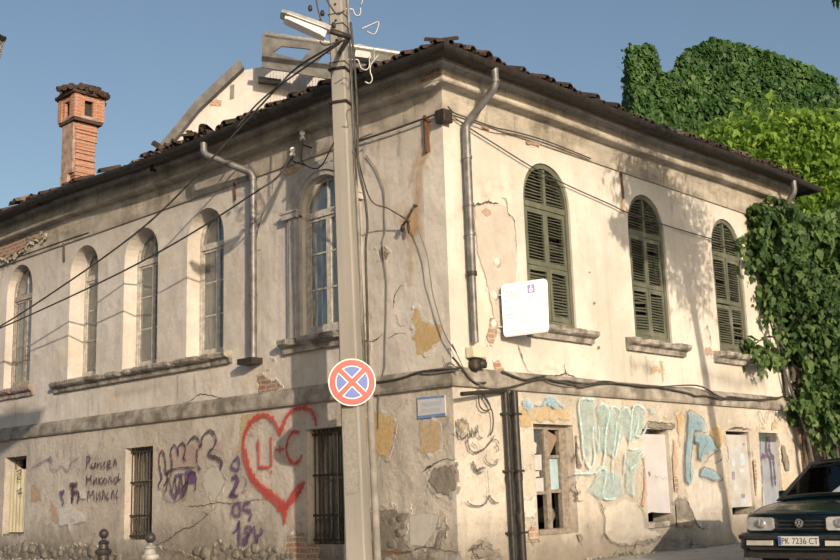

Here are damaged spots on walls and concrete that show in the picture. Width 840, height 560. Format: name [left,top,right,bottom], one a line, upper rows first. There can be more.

flaking render [474,201,517,347]
peeling [410,305,445,357]
flaking render [254,372,284,393]
peeling [366,410,398,462]
flaking render [417,417,461,501]
peeling [510,402,583,473]
peeling [707,414,723,450]
crack [158,499,263,545]
flaking render [281,530,324,560]